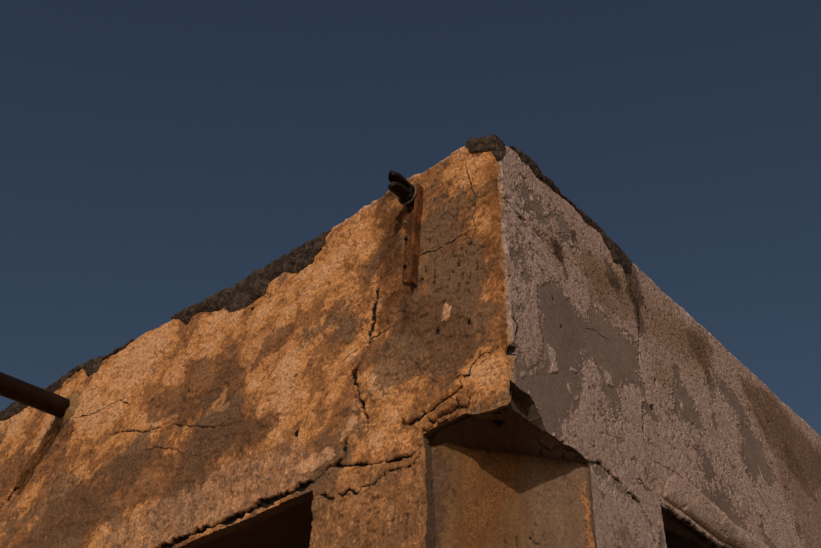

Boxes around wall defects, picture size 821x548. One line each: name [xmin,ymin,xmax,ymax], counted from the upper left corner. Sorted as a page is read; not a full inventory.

crack [420,164,476,256]
crack [455,302,518,379]
peeling [493,248,660,444]
spalling [401,379,471,433]
crack [536,397,674,542]
peeling [659,526,703,548]
crack [667,508,726,548]
peeling [696,455,776,548]